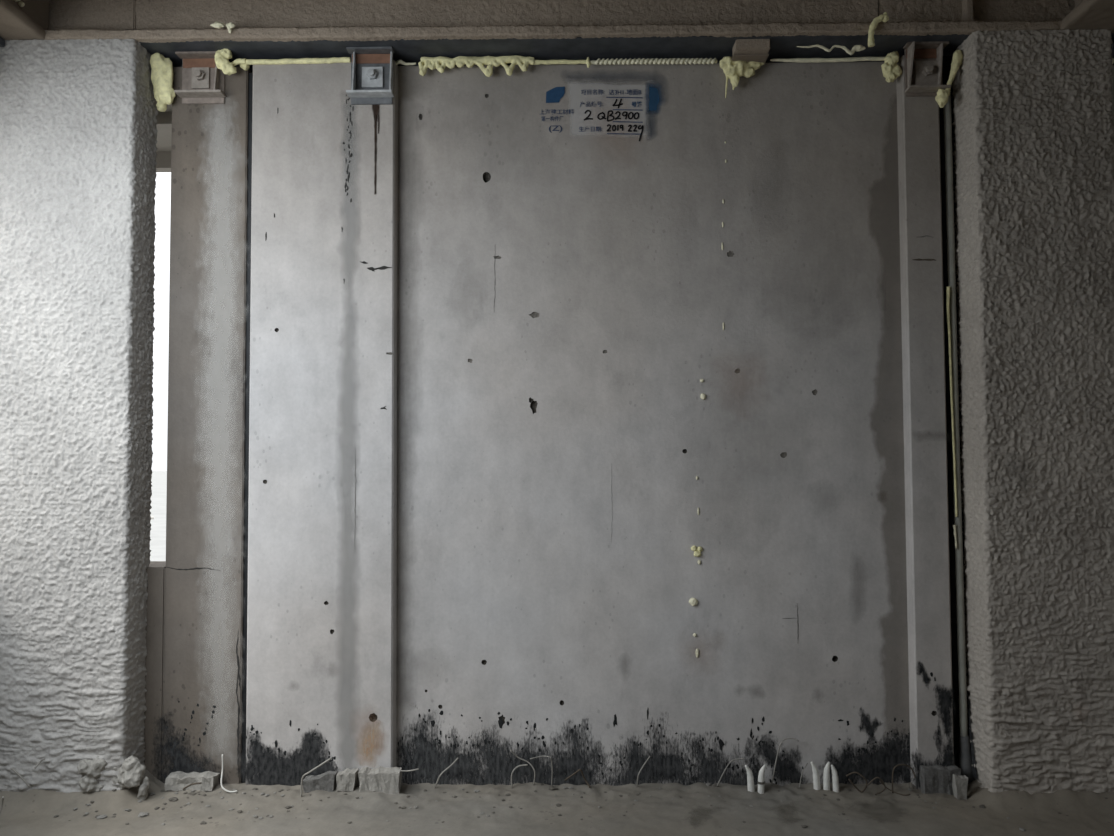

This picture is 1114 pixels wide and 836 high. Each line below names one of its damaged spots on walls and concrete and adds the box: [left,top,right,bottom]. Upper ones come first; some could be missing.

water stain [372,105,380,194]
water stain [154,704,223,783]
water stain [238,720,338,786]
water stain [397,709,806,786]
water stain [825,662,954,789]
water stain [966,684,977,780]